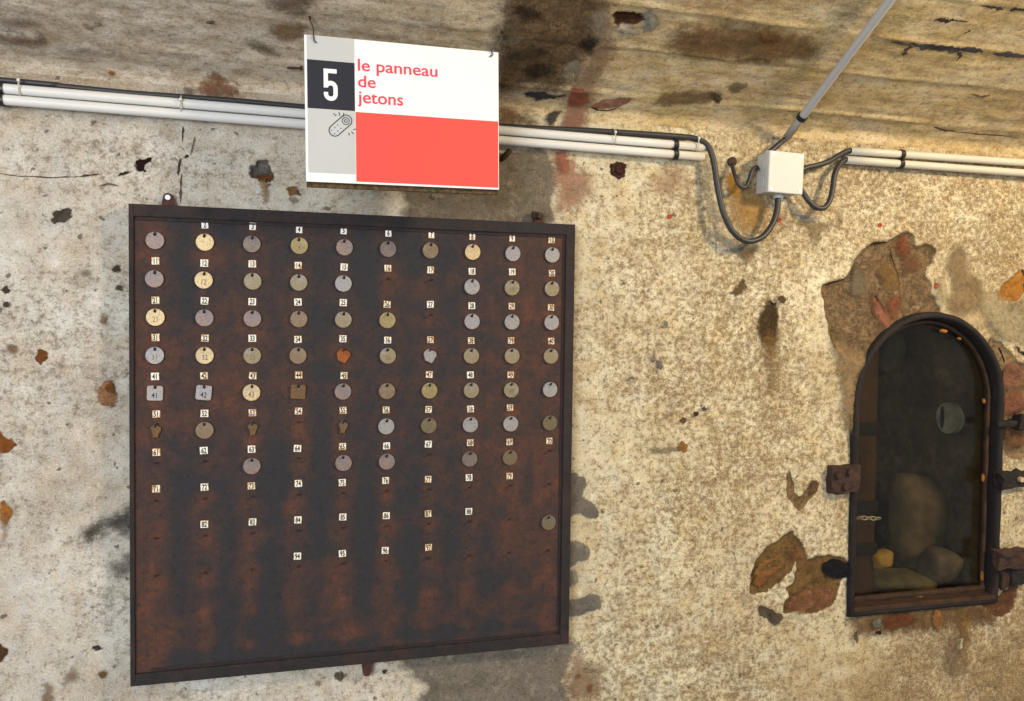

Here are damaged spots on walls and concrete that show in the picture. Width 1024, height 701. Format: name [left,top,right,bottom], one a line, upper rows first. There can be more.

crack [891,5,1024,61]
corrosion [184,73,238,97]
damp [494,0,609,126]
peeling [565,88,631,127]
spalling [998,269,1024,301]
spalling [821,231,983,430]
spalling [989,338,1024,460]
peeling [786,471,819,511]
spalling [750,531,852,626]